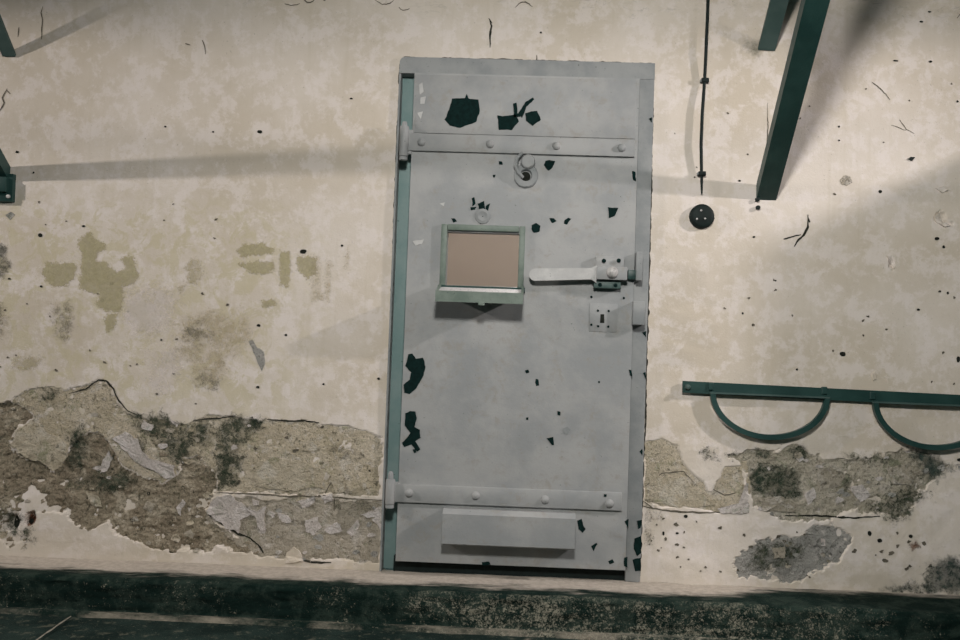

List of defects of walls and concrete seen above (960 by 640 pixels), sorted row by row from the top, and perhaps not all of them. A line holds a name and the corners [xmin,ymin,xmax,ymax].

leakage [0,243,10,276]
spalling [0,381,383,563]
spalling [608,439,960,583]